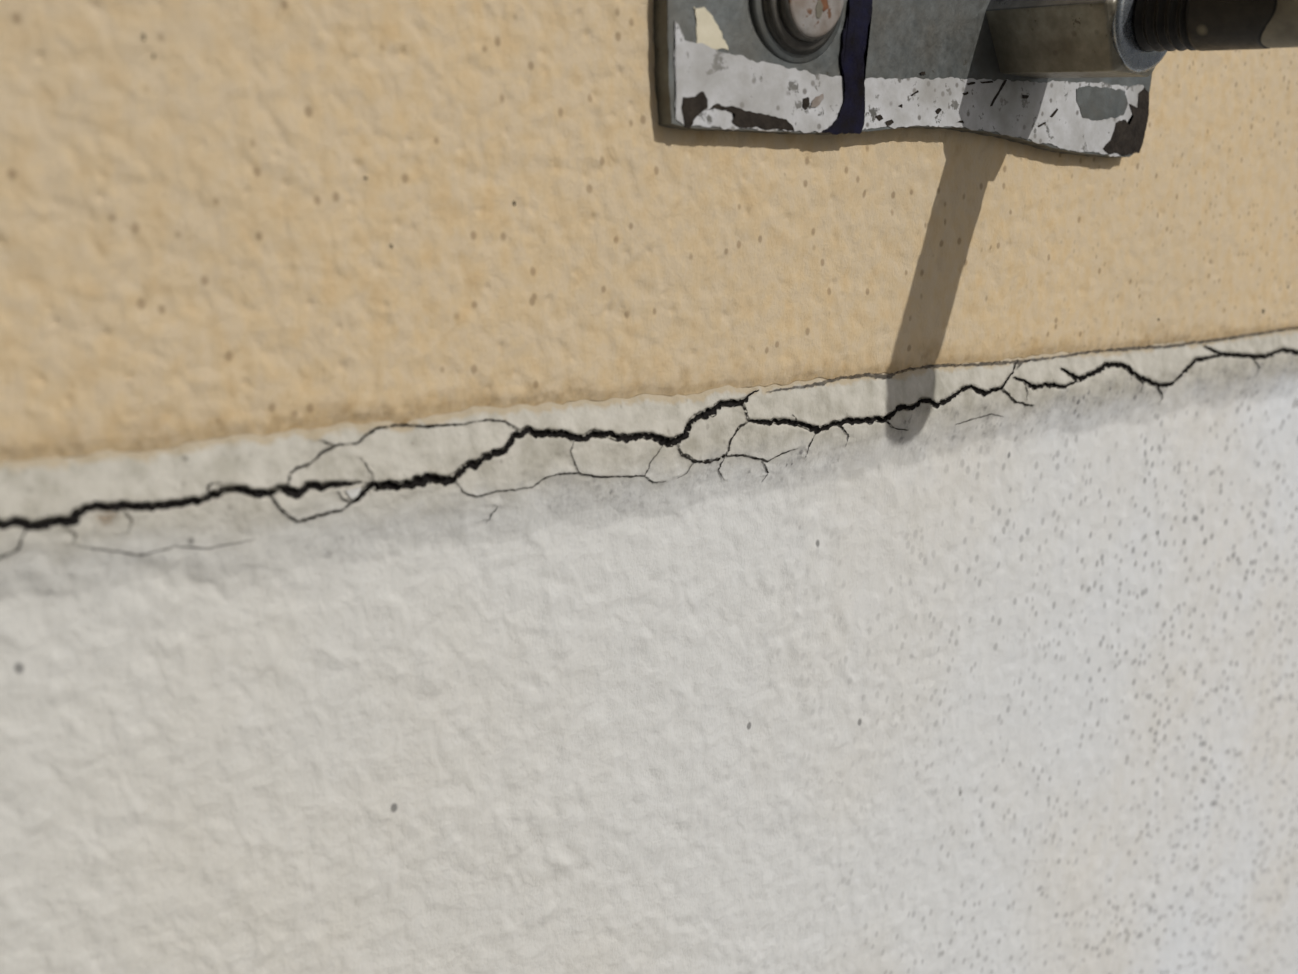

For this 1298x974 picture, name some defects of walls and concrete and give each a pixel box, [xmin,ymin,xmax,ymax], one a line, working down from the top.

crack [0,327,1298,558]